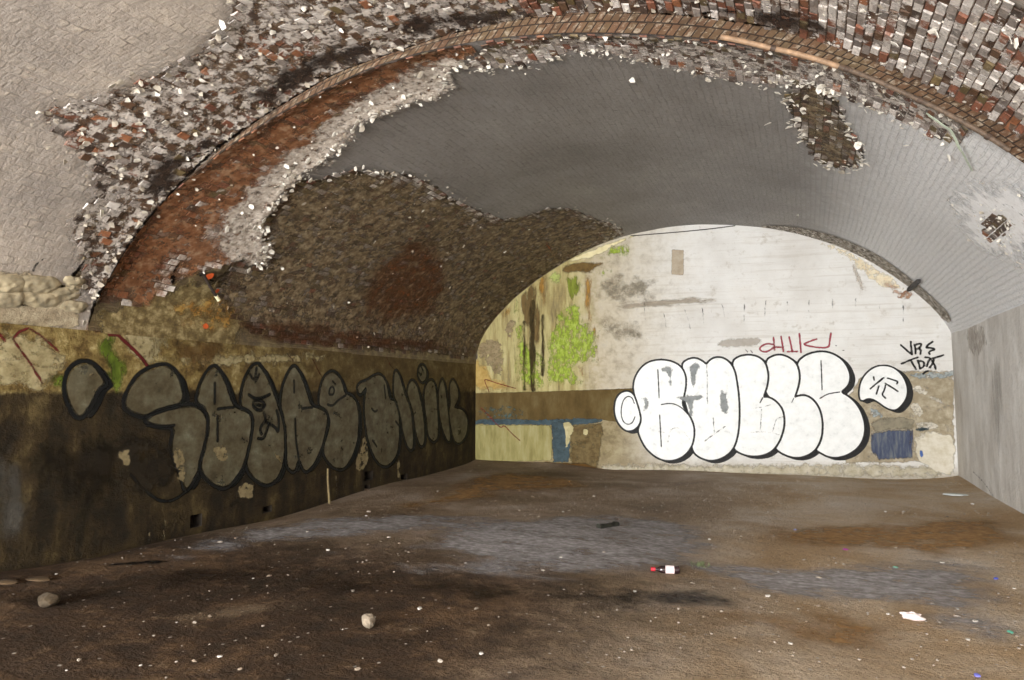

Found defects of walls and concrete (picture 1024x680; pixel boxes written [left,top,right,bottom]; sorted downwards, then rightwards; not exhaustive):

spalling [30,0,1024,375]
leakage [521,285,544,392]
peeling [563,422,588,447]
peeling [910,386,940,429]